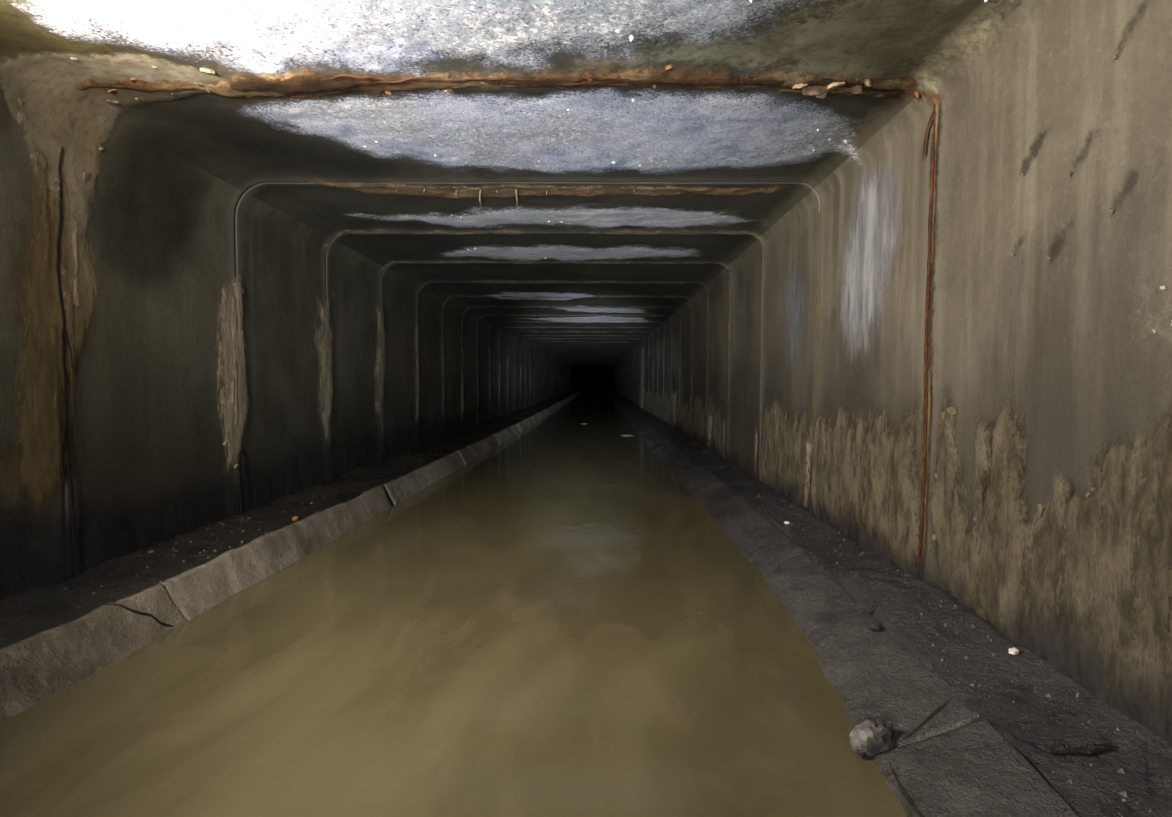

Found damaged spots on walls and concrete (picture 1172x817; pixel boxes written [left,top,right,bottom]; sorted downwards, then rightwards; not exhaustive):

water stain [0,0,1014,98]
water stain [245,87,856,175]
crack [56,146,77,575]
corrosion [76,65,941,572]
water stain [324,207,765,271]
water stain [841,176,894,345]
water stain [453,280,1172,747]
crack [107,604,174,627]